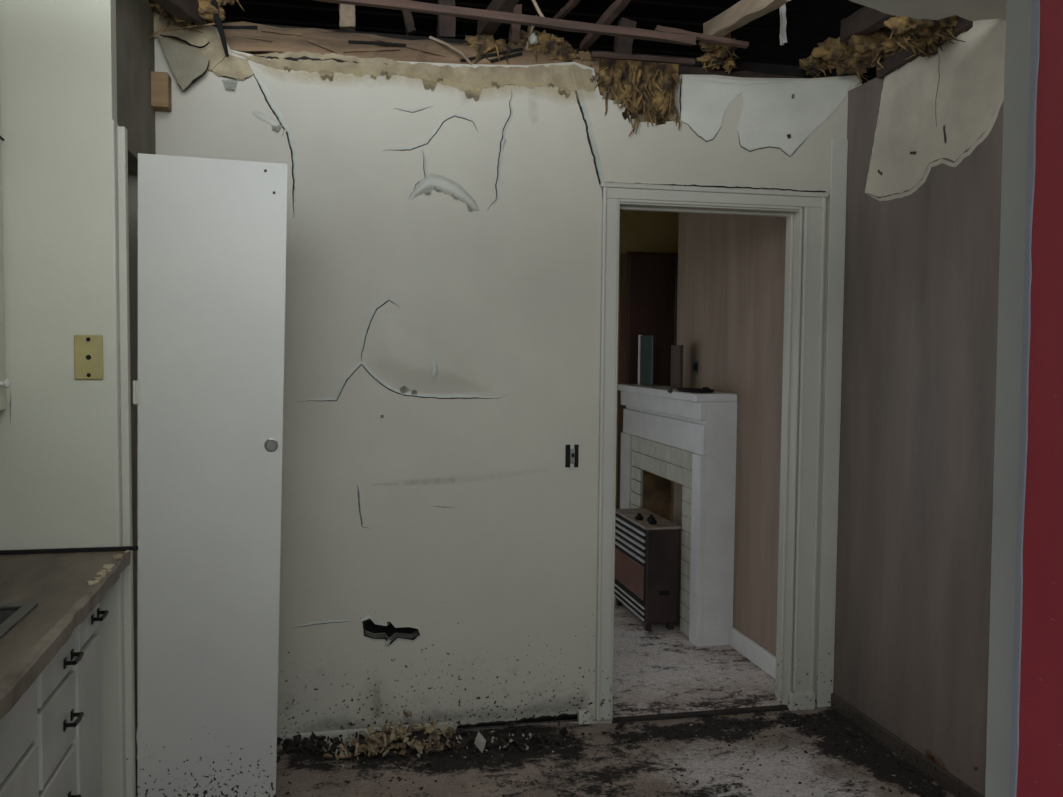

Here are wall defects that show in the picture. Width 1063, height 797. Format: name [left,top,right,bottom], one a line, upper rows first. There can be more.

crack [383,80,516,211]
peeling [154,11,850,157]
crack [571,72,826,192]
crack [298,297,509,402]
hole [361,615,422,648]